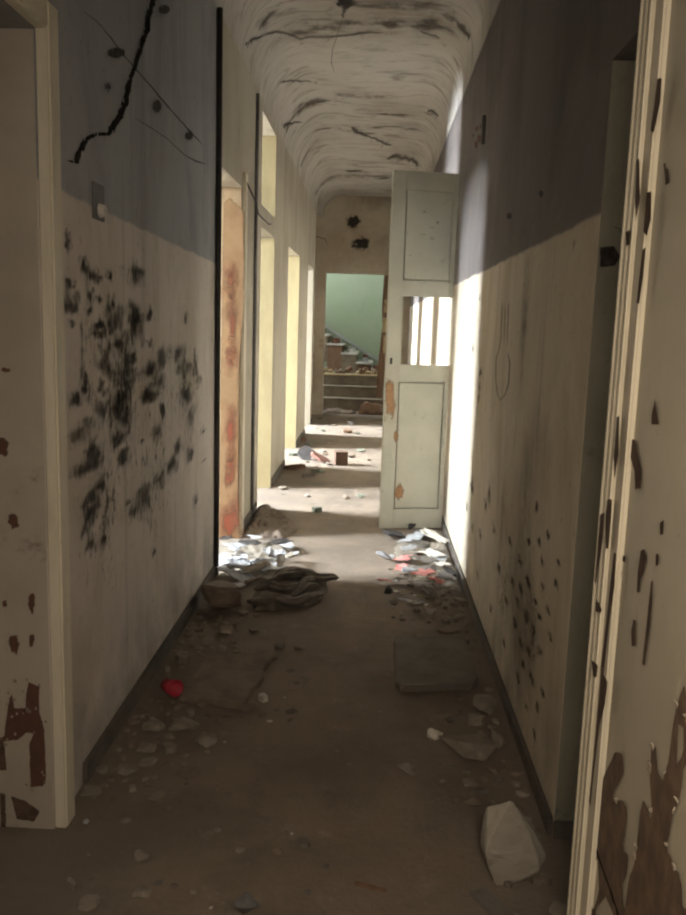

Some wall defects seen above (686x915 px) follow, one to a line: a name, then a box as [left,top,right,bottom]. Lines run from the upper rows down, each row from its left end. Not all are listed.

crack [68,0,205,164]
peeling [651,78,662,132]
peeling [635,159,651,235]
spalling [600,230,630,267]
peeling [637,248,645,304]
leakage [64,258,152,477]
leakage [142,343,202,443]
leakage [158,442,193,484]
peeling [629,439,642,489]
leakage [81,480,115,549]
peeling [589,499,686,915]
peeling [0,678,47,827]